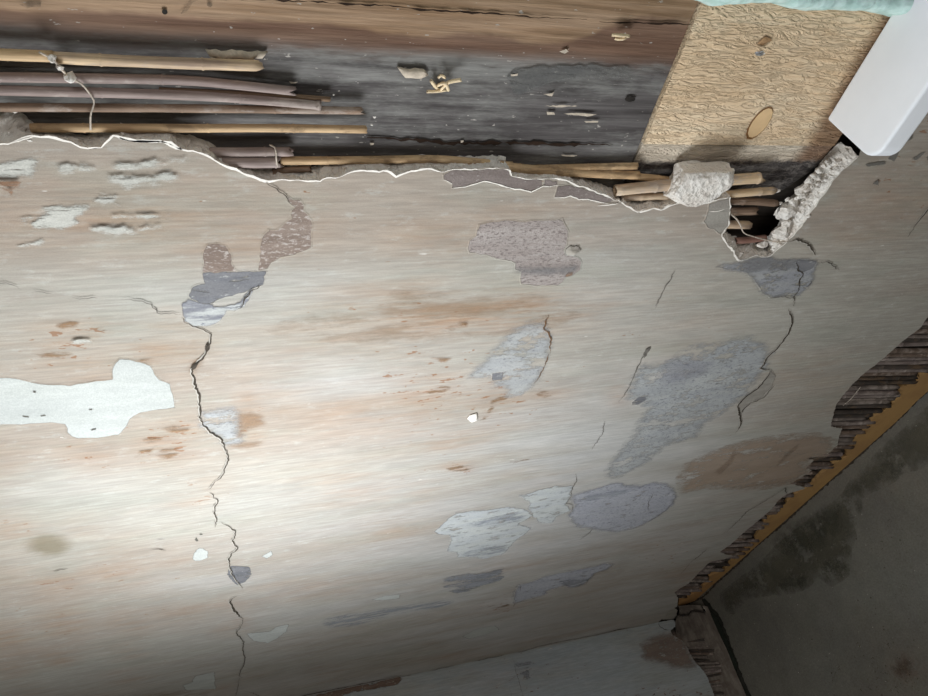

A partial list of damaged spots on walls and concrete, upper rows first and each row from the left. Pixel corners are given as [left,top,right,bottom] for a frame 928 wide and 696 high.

flaking render [0,112,680,213]
peeling [182,194,314,326]
peeling [466,217,583,287]
peeling [702,142,898,299]
peeling [470,324,549,396]
crack [537,315,552,380]
crack [619,348,650,401]
peeling [609,338,776,477]
crack [734,239,836,433]
crack [124,299,259,696]
peeling [521,486,573,523]
leakage [678,434,830,492]